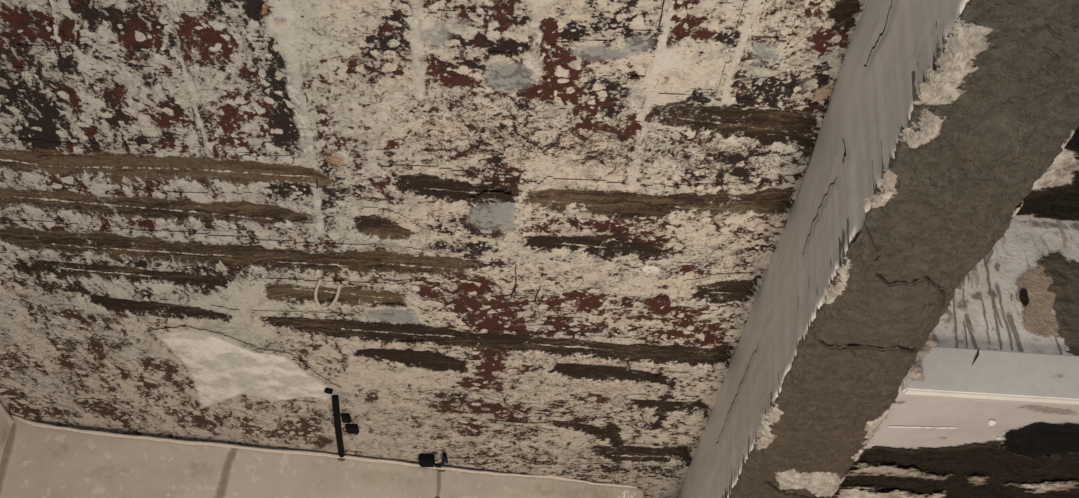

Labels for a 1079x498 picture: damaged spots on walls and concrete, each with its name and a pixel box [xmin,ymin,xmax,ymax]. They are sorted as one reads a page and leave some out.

peeling [0,0,296,151]
peeling [359,0,407,81]
peeling [429,0,530,92]
peeling [463,0,658,183]
peeling [673,0,740,60]
peeling [733,0,846,105]
peeling [252,183,308,203]
peeling [646,138,783,185]
peeling [403,212,766,342]
flaking render [0,276,382,449]
peeling [414,353,614,441]
peeling [441,454,663,481]